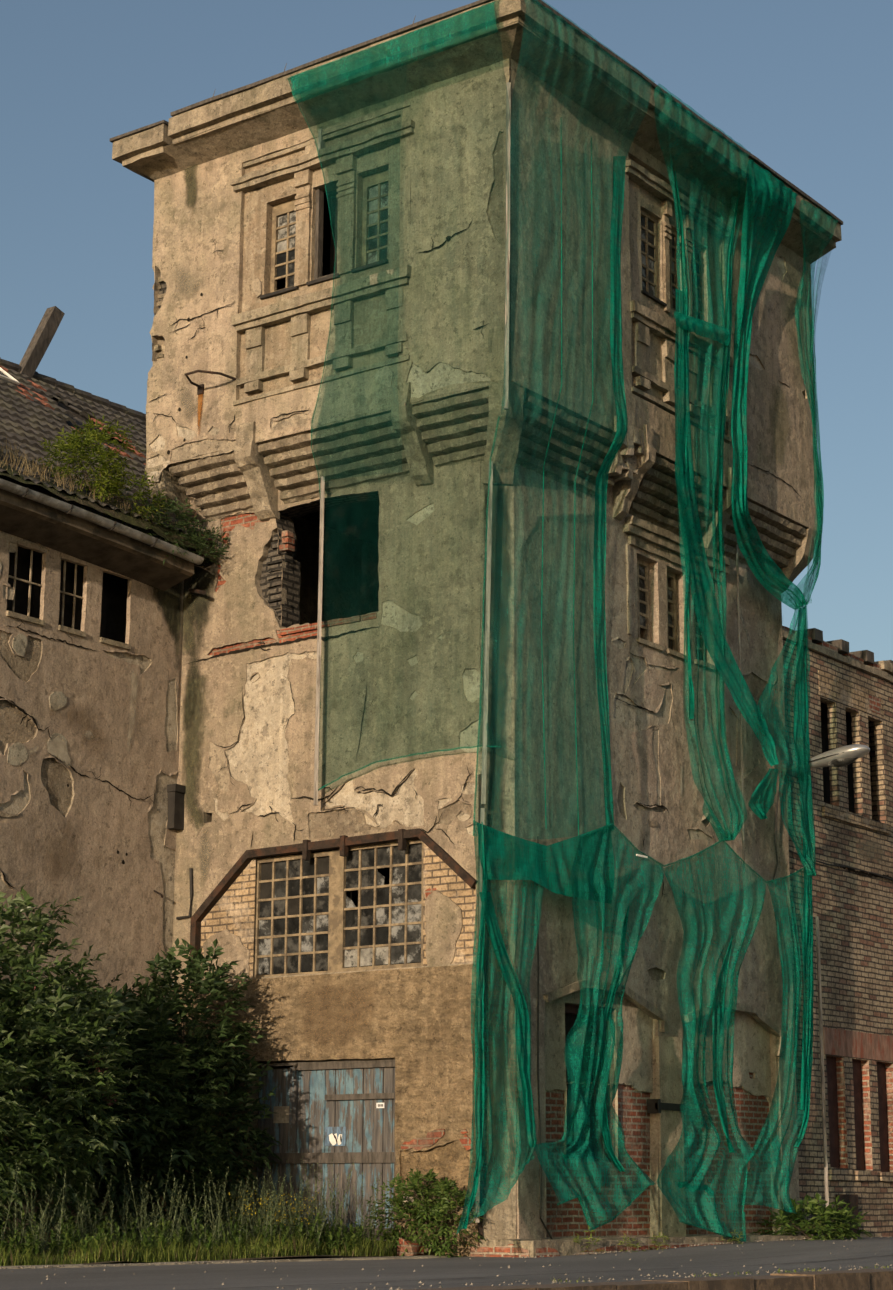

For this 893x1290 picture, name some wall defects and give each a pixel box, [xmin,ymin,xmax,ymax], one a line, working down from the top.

flaking render [209,511,478,841]
flaking render [406,504,434,525]